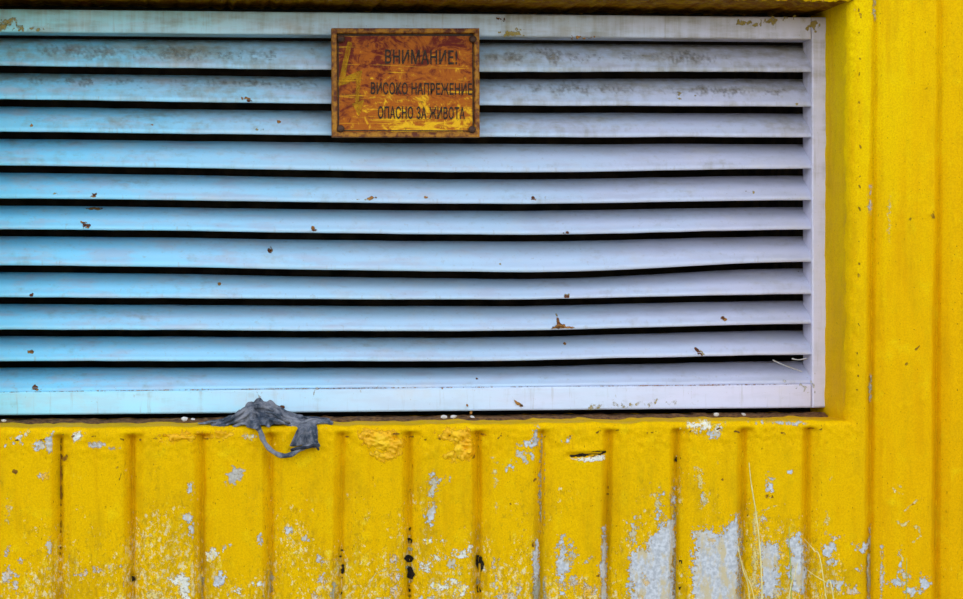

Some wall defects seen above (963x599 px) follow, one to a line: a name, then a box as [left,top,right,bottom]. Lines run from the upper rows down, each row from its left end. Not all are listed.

corrosion [0,17,44,32]
peeling [4,428,124,461]
peeling [492,425,546,487]
peeling [694,467,708,509]
peeling [418,472,523,599]
peeling [531,537,540,587]
peeling [554,524,608,599]
peeling [625,486,677,599]
peeling [689,510,860,599]
peeling [851,541,932,599]